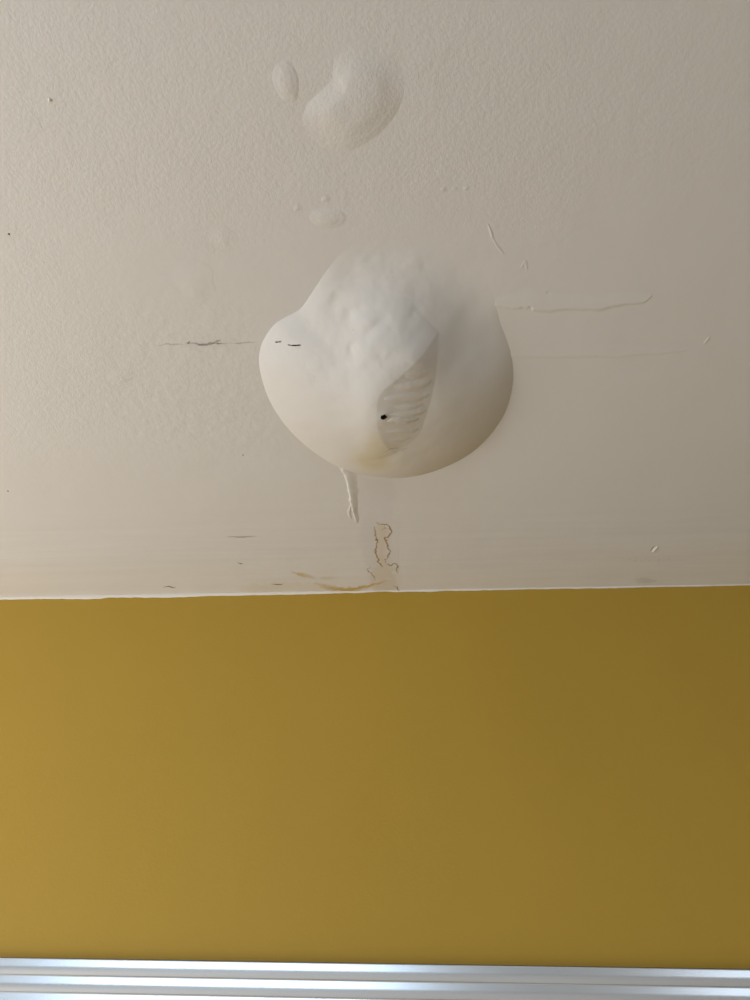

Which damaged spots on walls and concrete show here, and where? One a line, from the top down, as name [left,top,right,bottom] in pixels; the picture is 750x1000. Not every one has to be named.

crack [179,337,237,352]
damp [356,474,402,591]